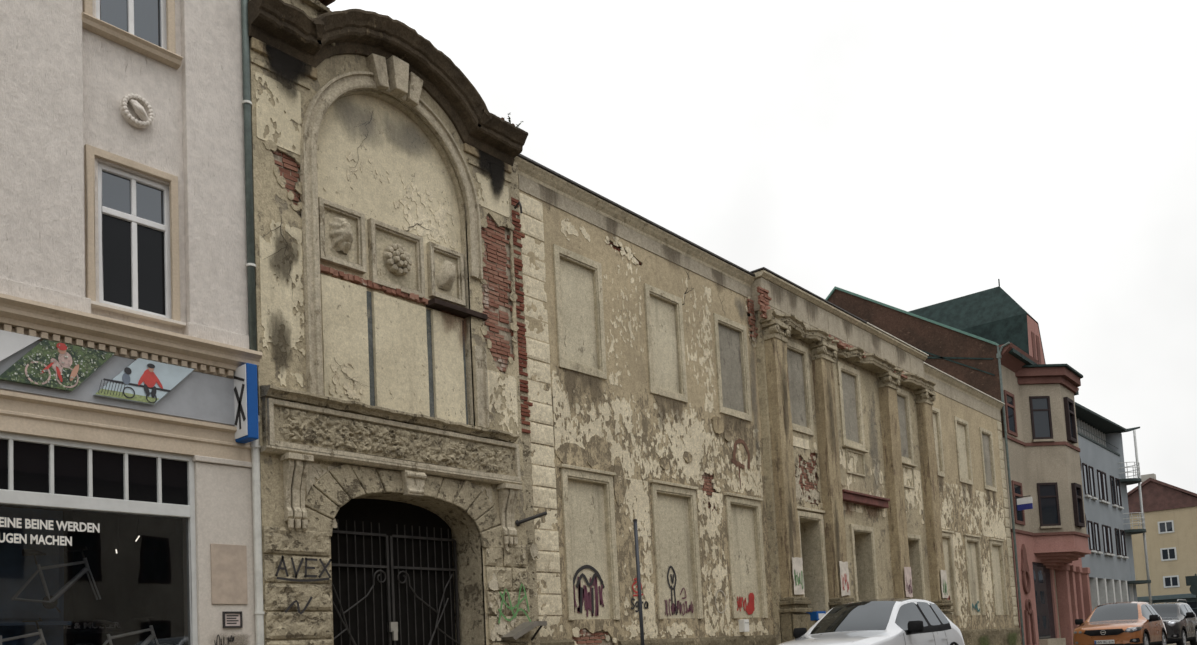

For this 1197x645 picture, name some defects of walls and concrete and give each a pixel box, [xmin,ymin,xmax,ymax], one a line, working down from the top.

flaking render [255,72,305,387]
flaking render [476,173,533,434]
peeling [560,218,590,242]
peeling [551,236,772,645]
peeling [939,482,1006,628]